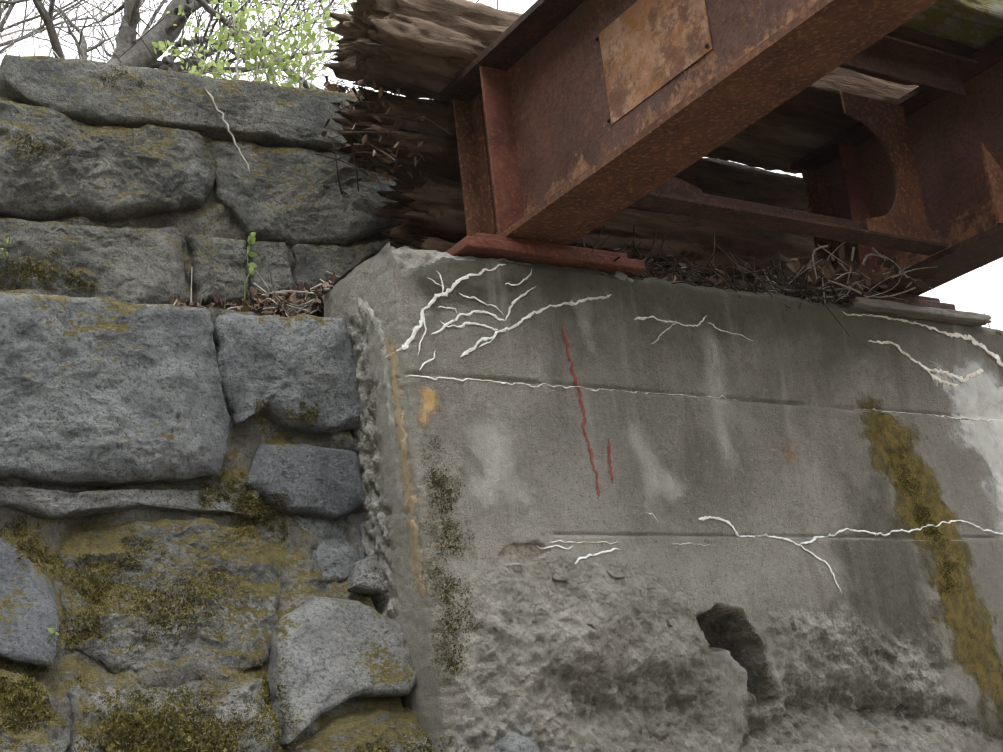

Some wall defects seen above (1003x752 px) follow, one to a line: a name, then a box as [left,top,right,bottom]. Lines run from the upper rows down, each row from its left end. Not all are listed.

rust [357,297,416,543]
crack [386,264,754,401]
damp [842,311,1003,532]
crack [868,340,983,387]
crack [854,408,1003,421]
crack [537,540,622,564]
crack [674,516,1003,593]
spalling [447,542,992,752]